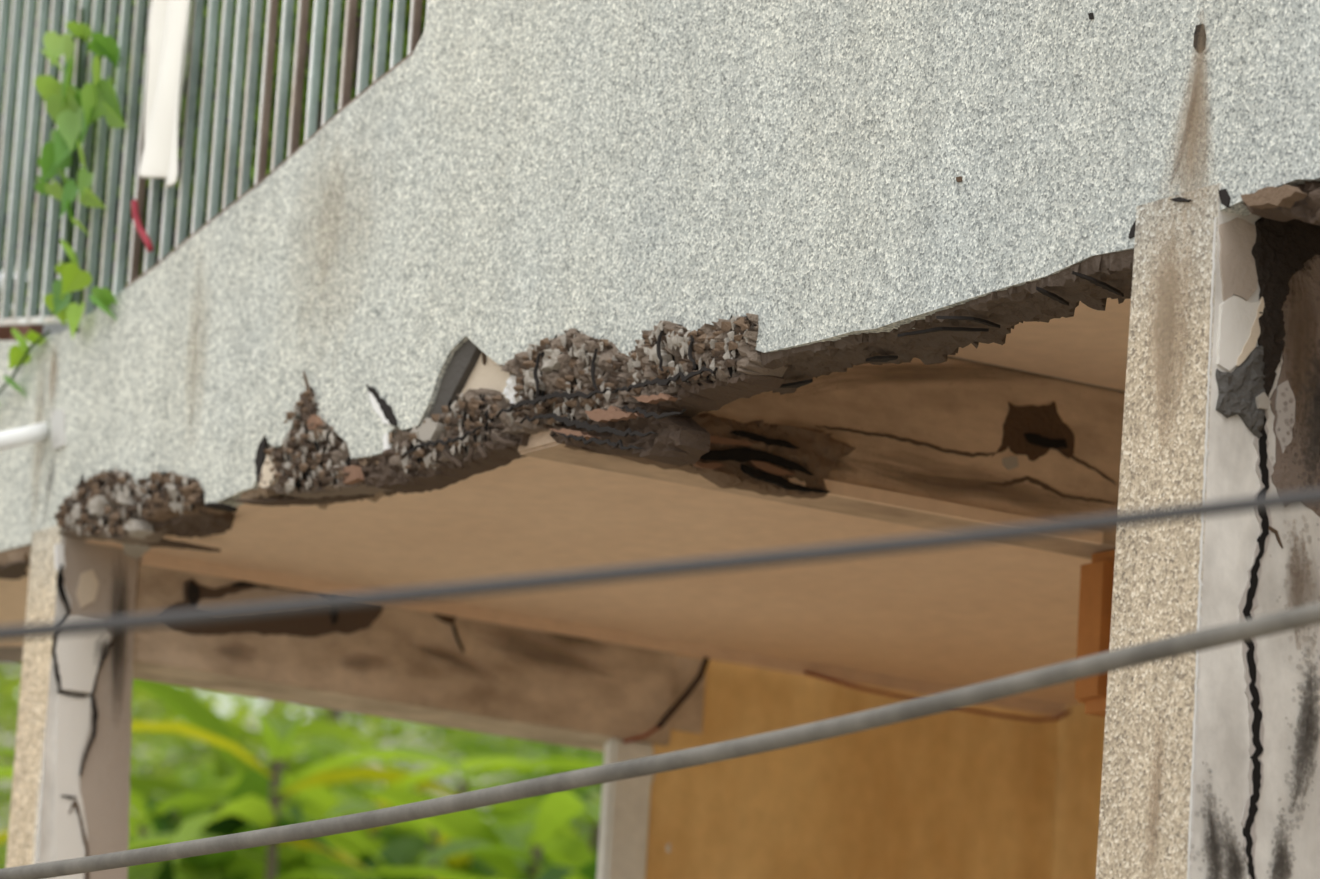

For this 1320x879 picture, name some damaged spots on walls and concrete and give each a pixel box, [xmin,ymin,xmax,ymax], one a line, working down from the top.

spalling [0,545,31,567]
crack [0,560,115,879]
spalling [54,249,1134,879]
crack [700,426,1116,504]
spalling [1241,639,1264,879]
crack [1243,410,1283,879]
peeling [1215,181,1320,621]